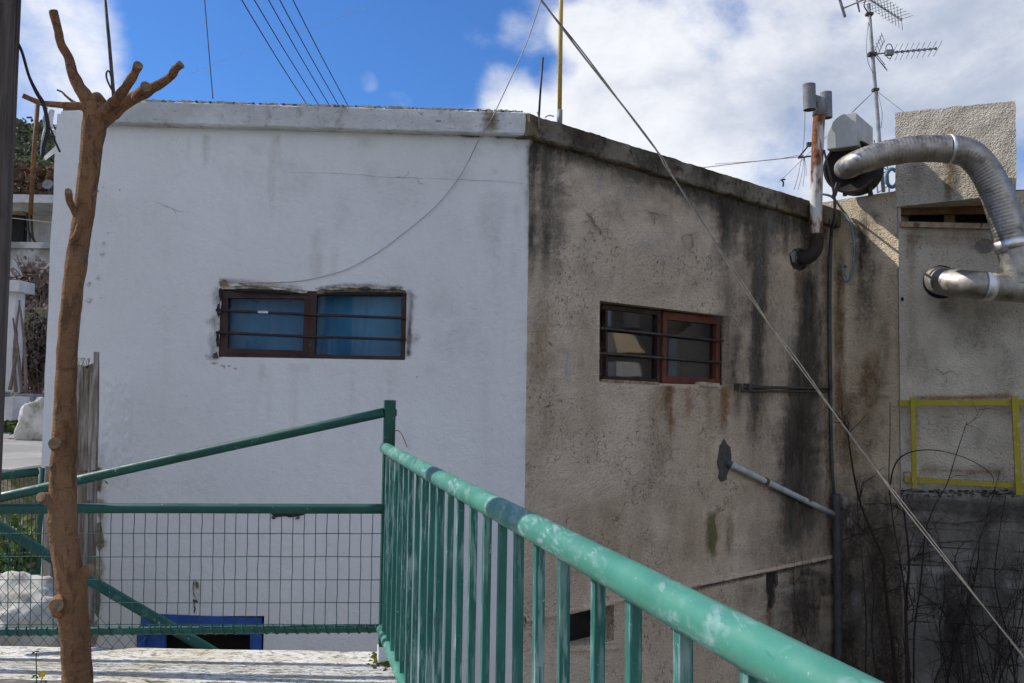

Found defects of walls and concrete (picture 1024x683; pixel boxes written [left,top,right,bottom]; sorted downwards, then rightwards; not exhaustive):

leakage [528,140,810,428]
leakage [708,514,718,553]
leakage [781,264,824,541]